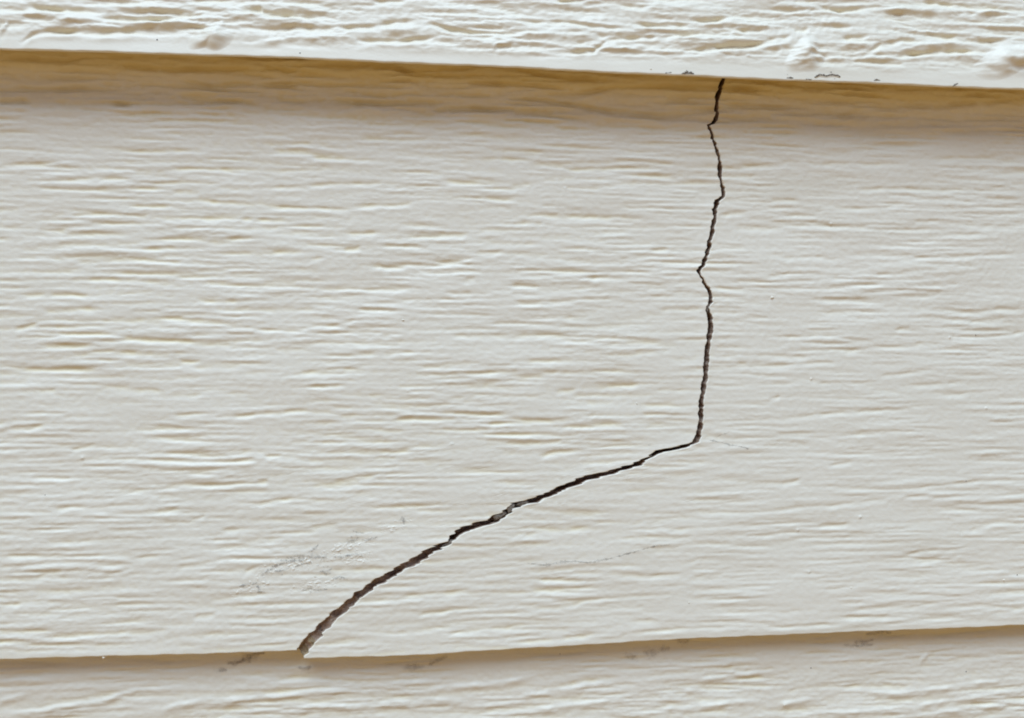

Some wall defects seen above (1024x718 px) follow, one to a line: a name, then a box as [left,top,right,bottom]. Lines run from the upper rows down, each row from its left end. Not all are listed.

crack [297,78,725,656]